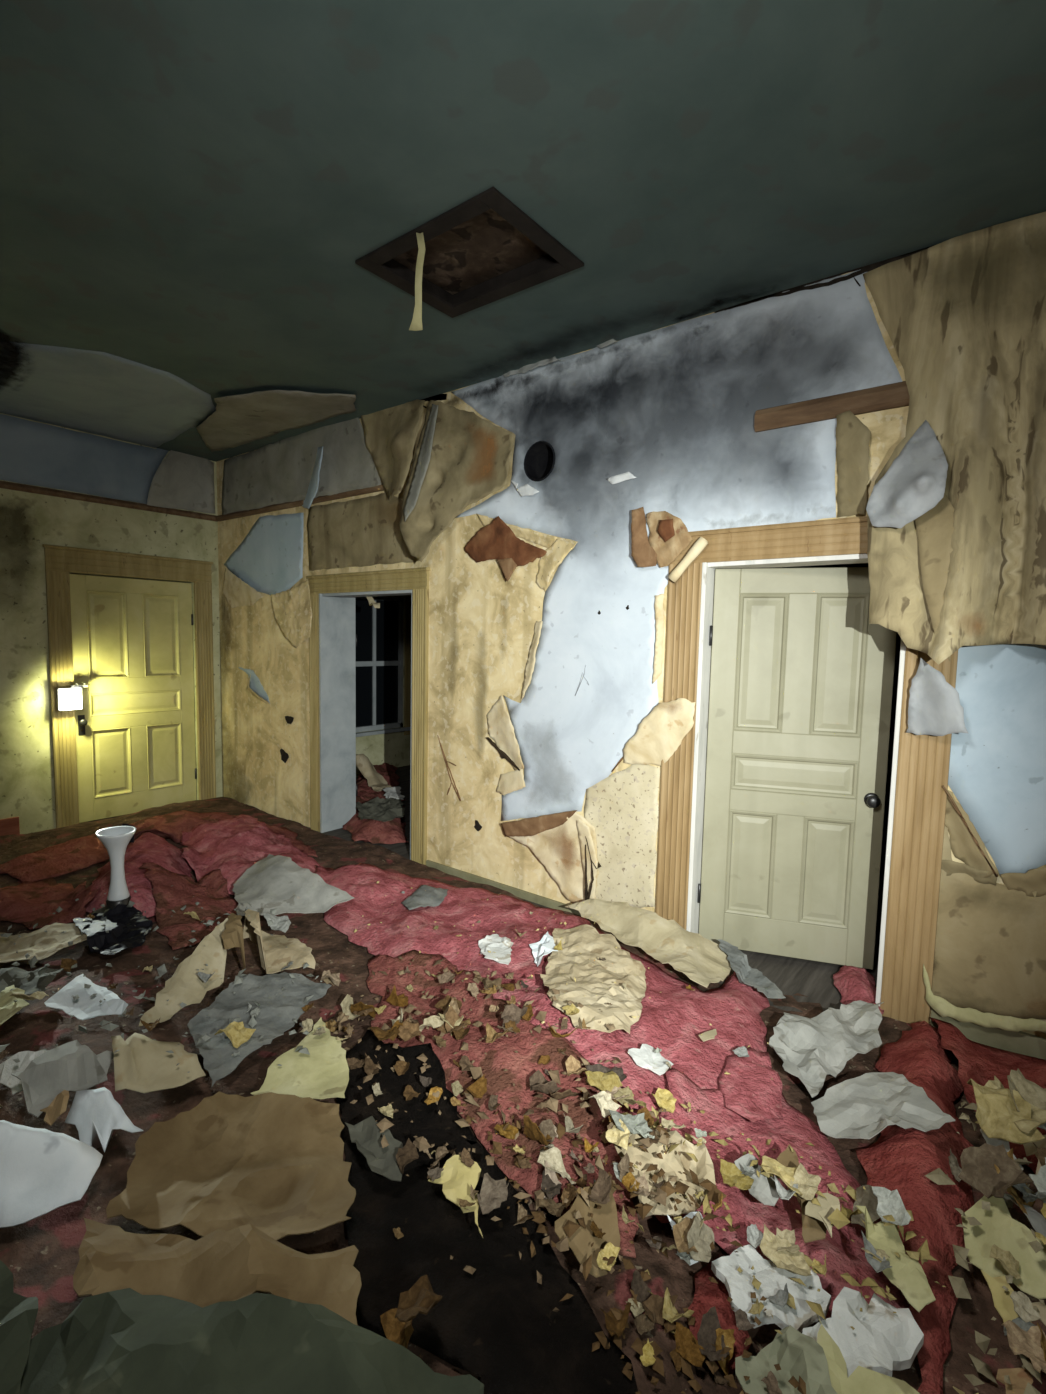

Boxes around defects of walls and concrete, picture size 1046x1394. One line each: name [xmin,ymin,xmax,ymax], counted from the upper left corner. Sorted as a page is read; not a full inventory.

flaking render [0,342,216,504]
flaking render [222,513,312,648]
flaking render [451,270,903,821]